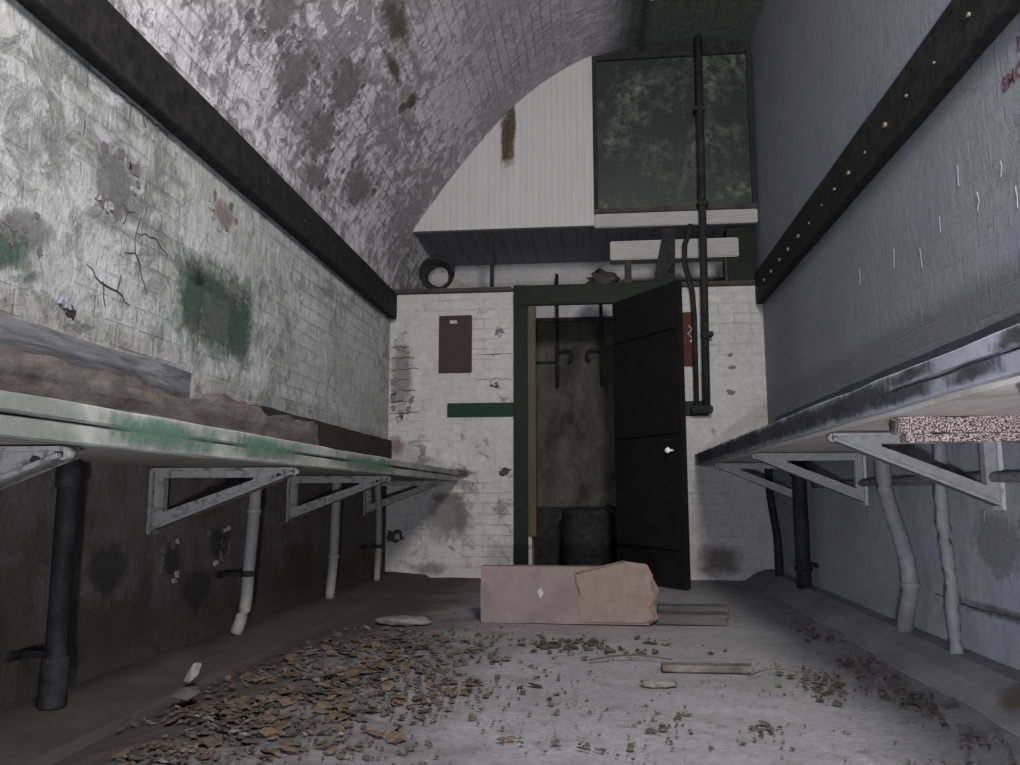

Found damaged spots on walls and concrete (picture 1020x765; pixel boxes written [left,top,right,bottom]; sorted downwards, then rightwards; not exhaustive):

water stain [0,231,28,269]
water stain [178,257,252,357]
water stain [974,606,1020,624]